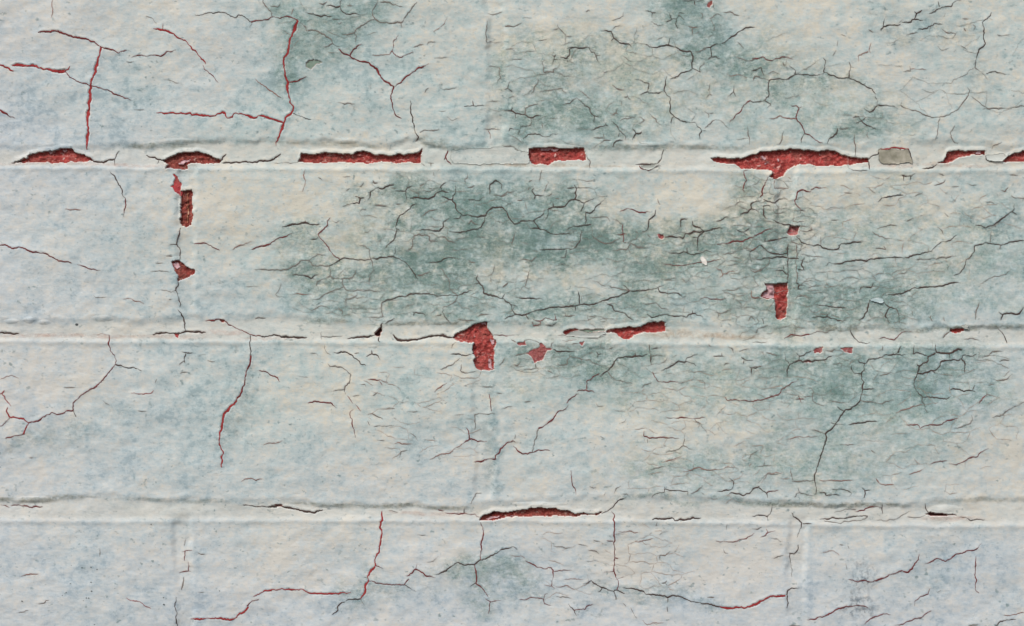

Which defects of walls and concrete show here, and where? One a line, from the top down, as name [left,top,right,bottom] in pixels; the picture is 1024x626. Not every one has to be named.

crack [0,0,456,217]
crack [464,0,1023,171]
peeling [22,149,92,164]
peeling [164,152,221,227]
peeling [300,151,422,164]
leakage [397,182,612,267]
peeling [711,148,912,179]
crack [0,333,157,439]
crack [153,283,307,467]
peeling [453,322,496,370]
crack [193,147,1024,626]
peeling [480,507,601,520]